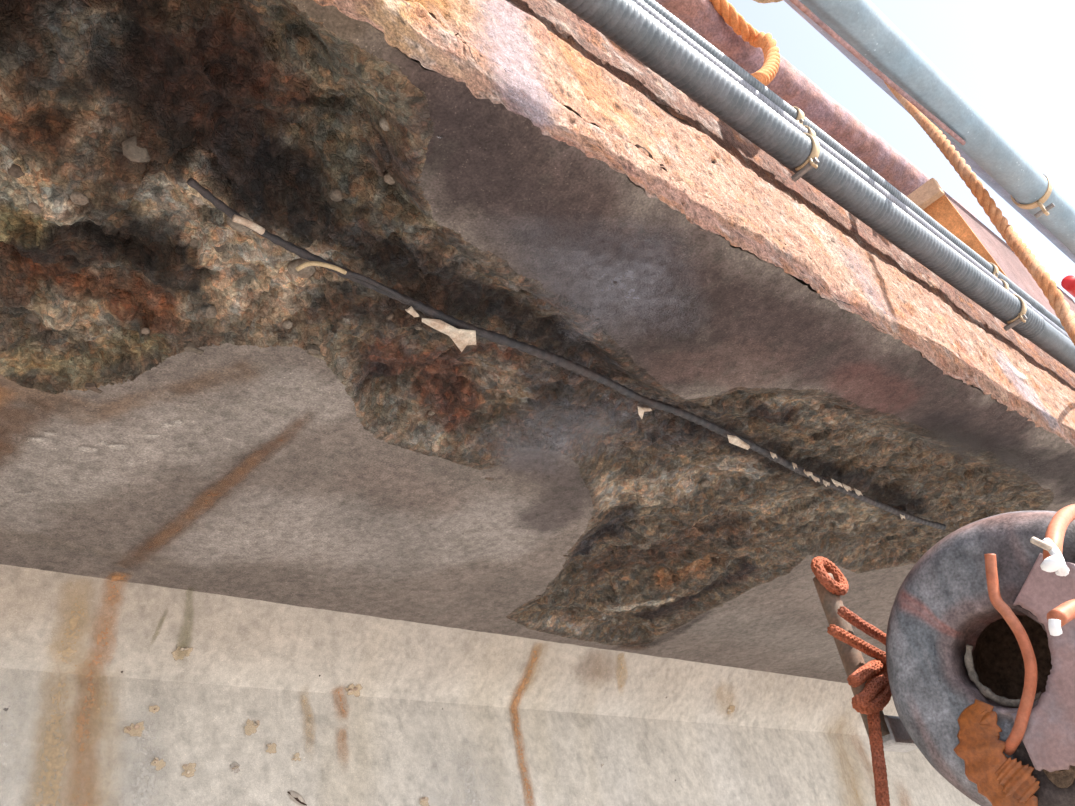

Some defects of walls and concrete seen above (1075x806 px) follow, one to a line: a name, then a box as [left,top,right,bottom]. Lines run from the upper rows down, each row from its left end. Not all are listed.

spalling [0,0,1054,645]
rust [511,650,537,806]